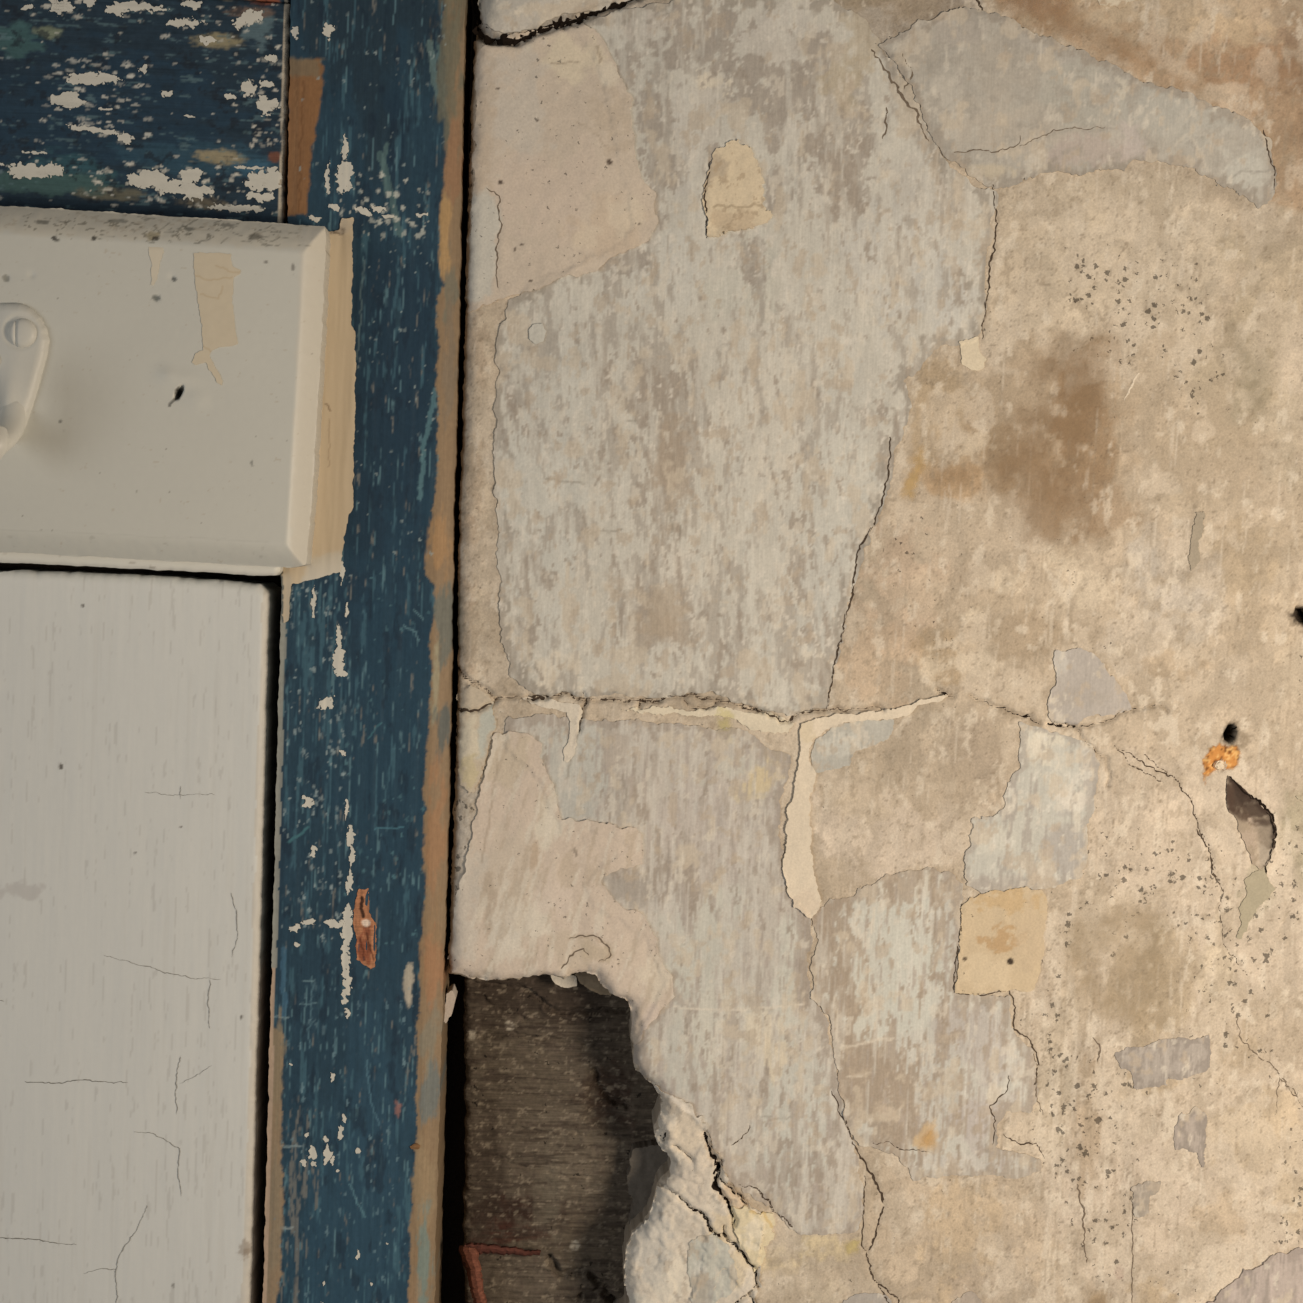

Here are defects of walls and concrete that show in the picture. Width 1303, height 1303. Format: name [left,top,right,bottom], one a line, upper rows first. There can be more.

peeling [50,71,135,145]
peeling [21,0,217,46]
peeling [126,165,283,213]
peeling [309,134,394,223]
crack [472,0,632,46]
crack [458,437,891,731]
peeling [448,0,1277,1303]
spalling [289,799,377,1019]
crack [937,690,1247,975]
corrosion [1203,744,1240,776]
crack [660,1126,793,1303]
crack [831,1091,926,1303]